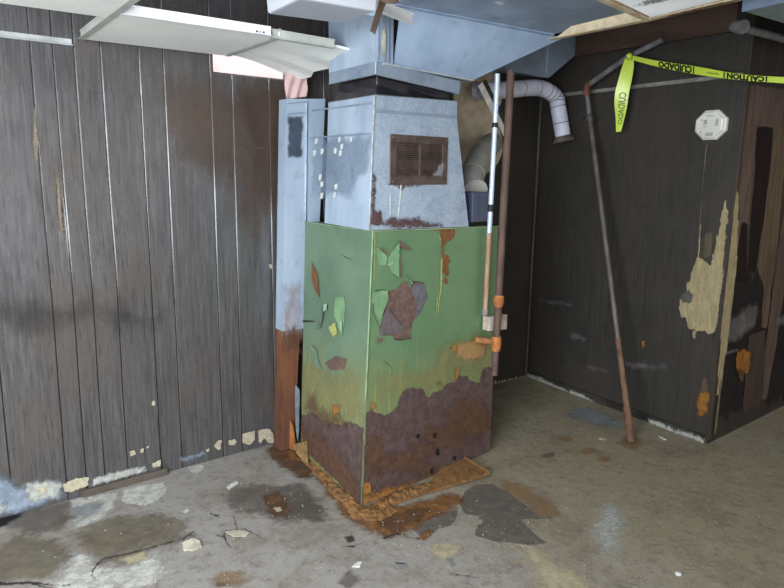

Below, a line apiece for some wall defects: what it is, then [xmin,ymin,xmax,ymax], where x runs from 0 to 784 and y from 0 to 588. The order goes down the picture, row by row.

peeling [679,201,729,339]
rust [736,349,751,381]
rust [697,377,709,416]
peeling [180,429,274,474]
rust [264,329,493,540]
damp [0,479,61,514]
spalling [63,460,167,528]
damp [414,484,547,545]
crack [92,532,192,577]